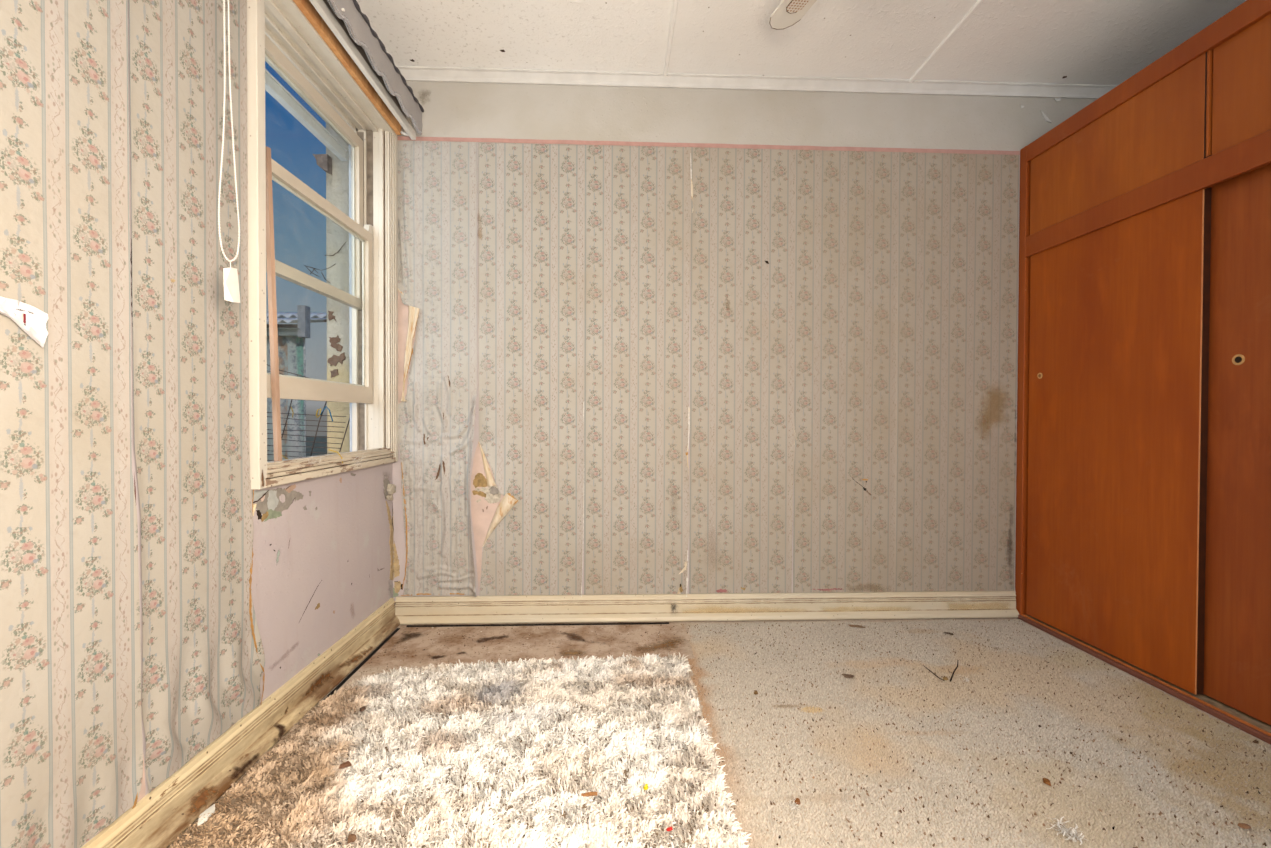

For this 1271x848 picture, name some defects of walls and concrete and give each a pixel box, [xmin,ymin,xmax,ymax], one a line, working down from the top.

peeling [398,289,419,404]
peeling [252,484,317,522]
flaking render [471,442,504,589]